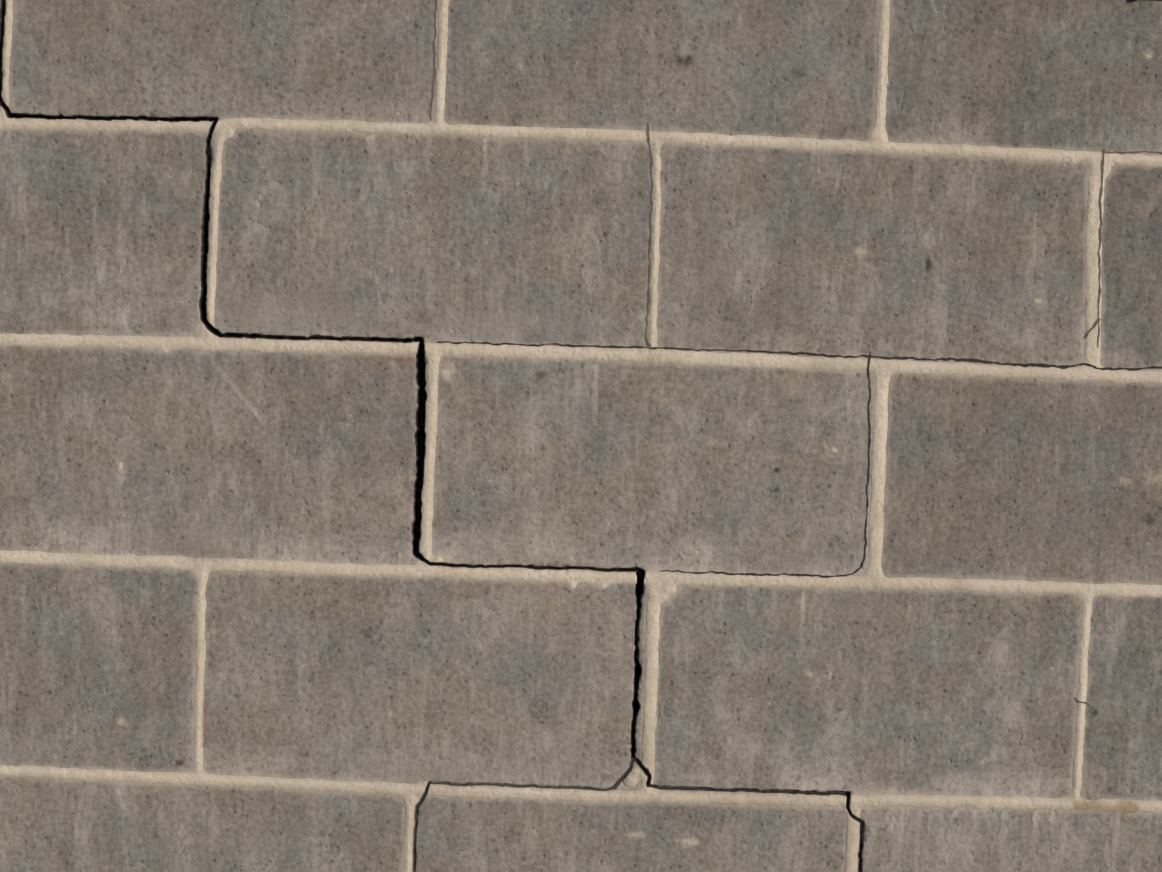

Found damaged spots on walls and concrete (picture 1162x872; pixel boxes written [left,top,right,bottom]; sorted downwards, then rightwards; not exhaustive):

crack [0,0,864,872]
crack [437,122,1162,578]